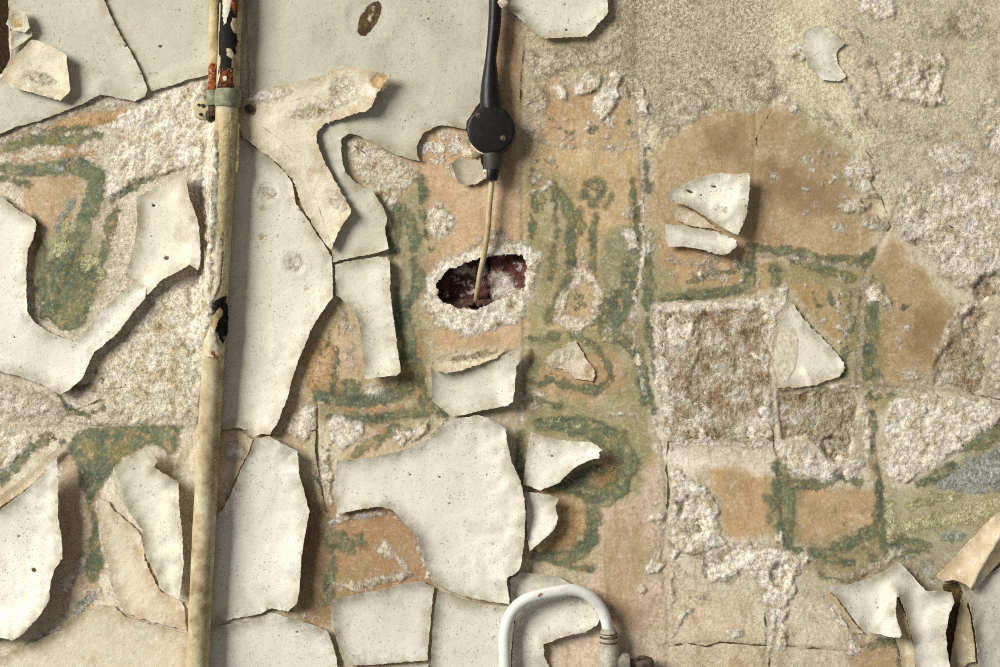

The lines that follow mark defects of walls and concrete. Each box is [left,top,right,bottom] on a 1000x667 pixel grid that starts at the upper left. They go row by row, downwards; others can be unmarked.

corrosion [206,63,234,90]
peeling [125,171,201,294]
peeling [208,295,229,343]
flaking render [432,345,505,374]
spalling [436,254,527,310]
flaking render [543,341,595,381]
damp [282,70,1000,651]
peeling [665,172,750,255]
spalling [658,261,866,461]
peeling [523,432,602,550]
peeling [0,445,188,667]
peeling [825,512,1000,667]